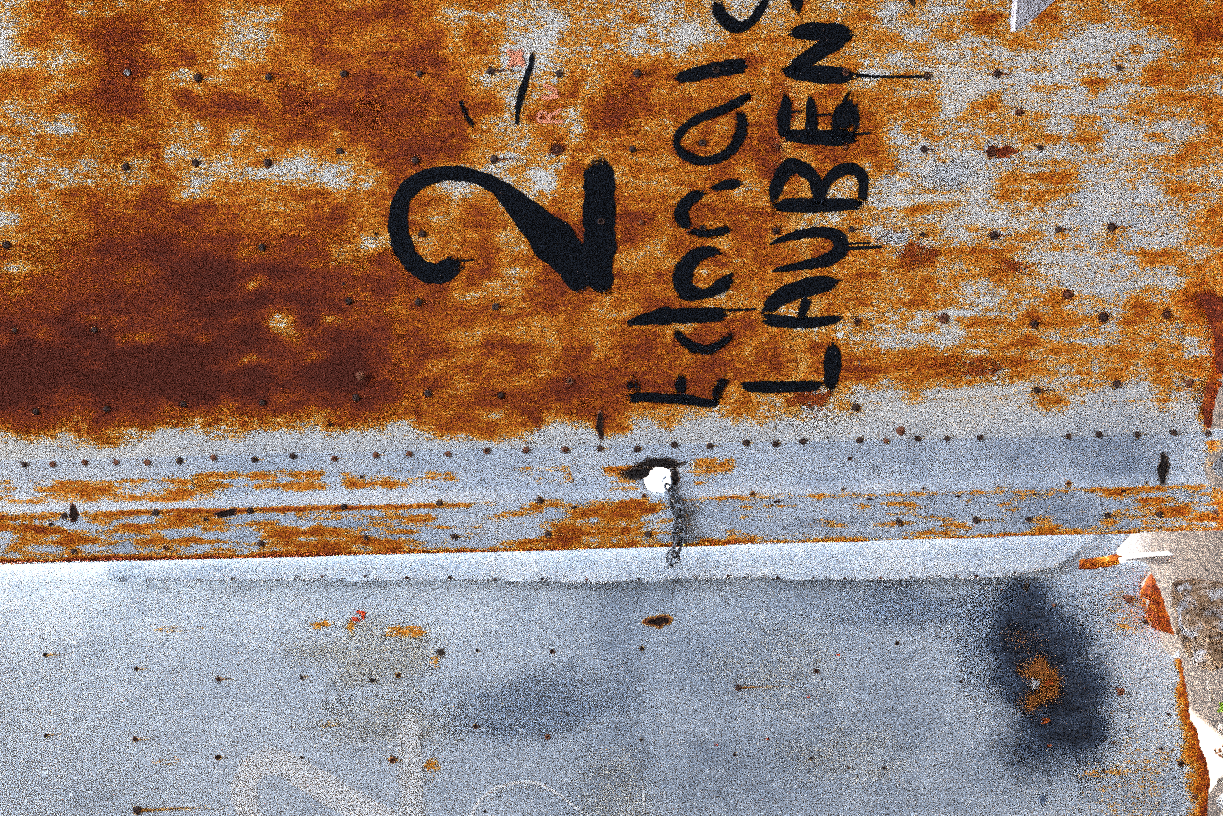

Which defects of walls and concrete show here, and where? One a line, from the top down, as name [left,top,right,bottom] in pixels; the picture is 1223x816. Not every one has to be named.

rust [0,0,1223,565]
rust [642,614,673,629]
leakage [838,577,1111,778]
rust [1076,658,1211,816]